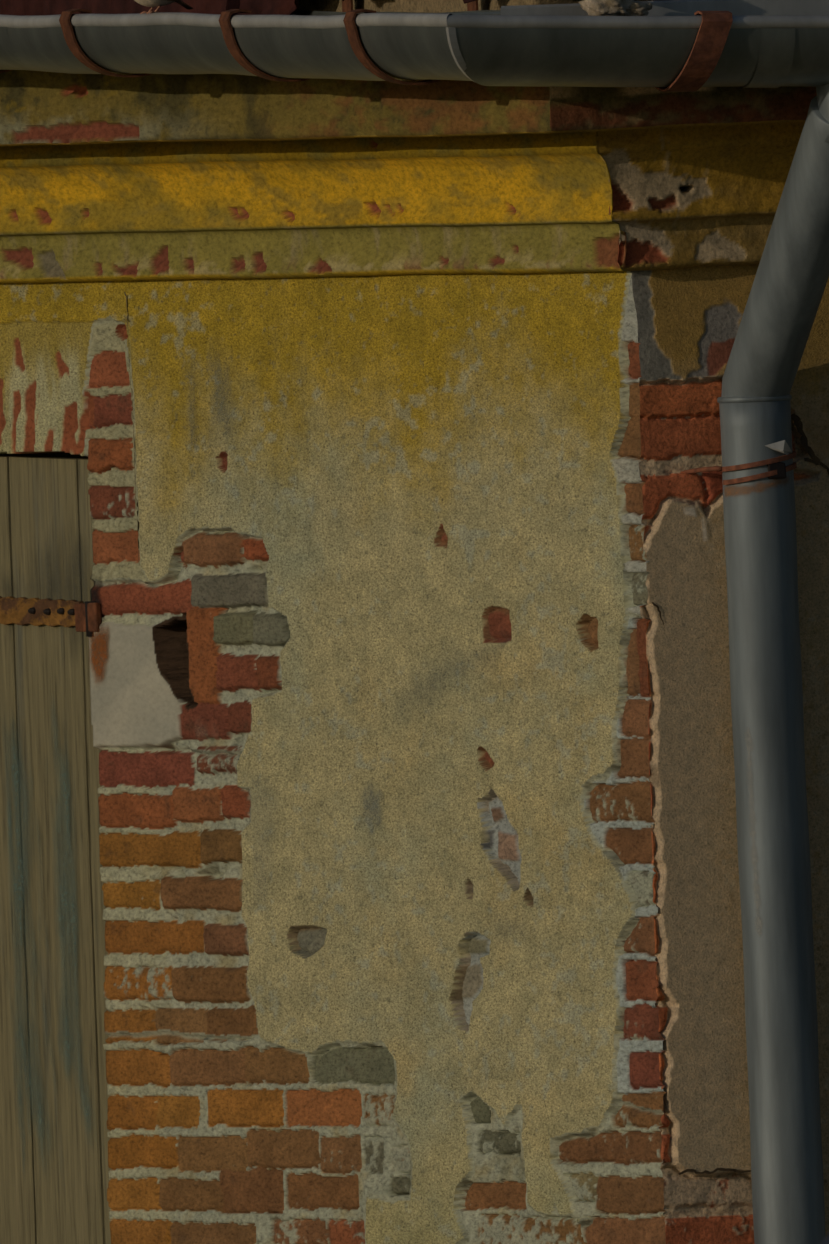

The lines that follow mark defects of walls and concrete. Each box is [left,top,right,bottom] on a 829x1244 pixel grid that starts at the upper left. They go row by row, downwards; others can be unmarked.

spalling [0,316,413,1244]
spalling [433,523,449,549]
spalling [449,147,754,1244]